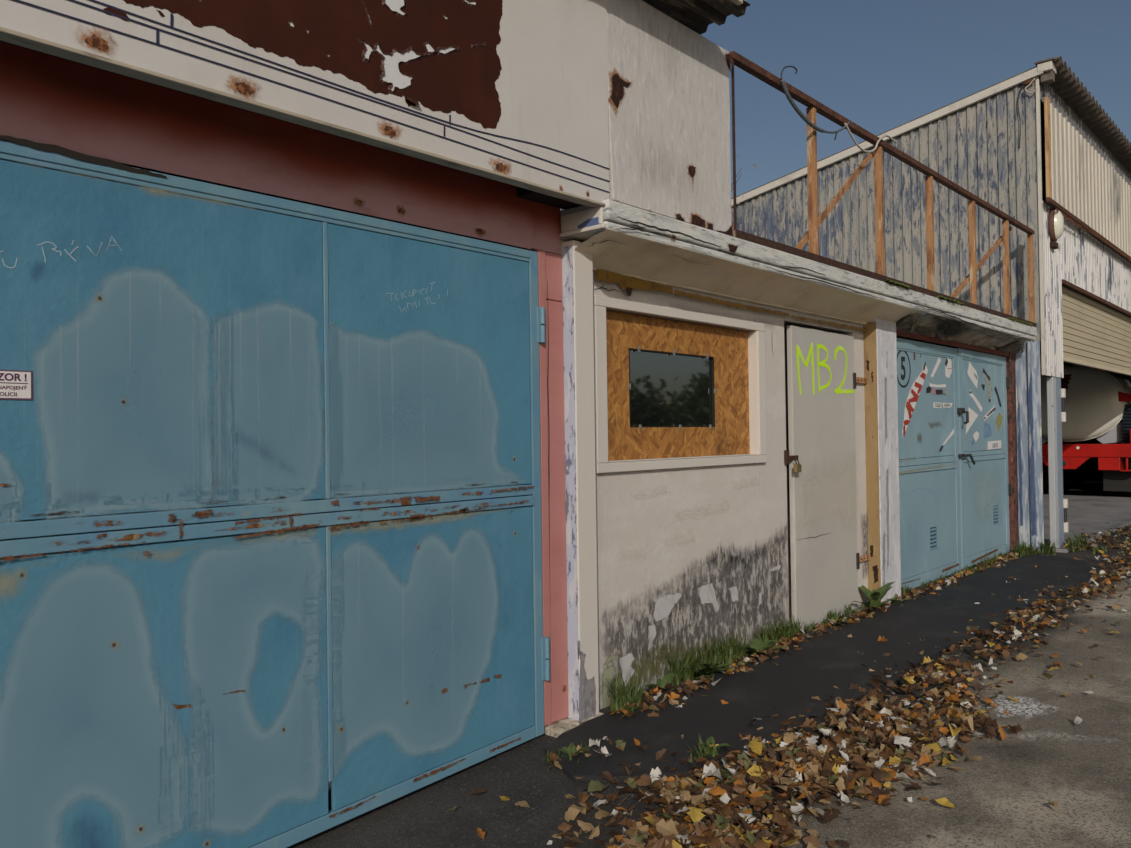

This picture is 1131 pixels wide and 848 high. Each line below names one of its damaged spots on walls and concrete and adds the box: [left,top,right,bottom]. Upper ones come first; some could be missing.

peeling [103,7,129,21]
peeling [382,0,407,19]
rust [81,31,114,53]
peeling [357,37,487,105]
rust [229,76,256,98]
rust [379,123,400,137]
rust [0,482,534,562]
flaking render [697,583,719,612]
flaking render [729,587,739,602]
flaking render [648,593,682,650]
water stain [606,536,787,698]